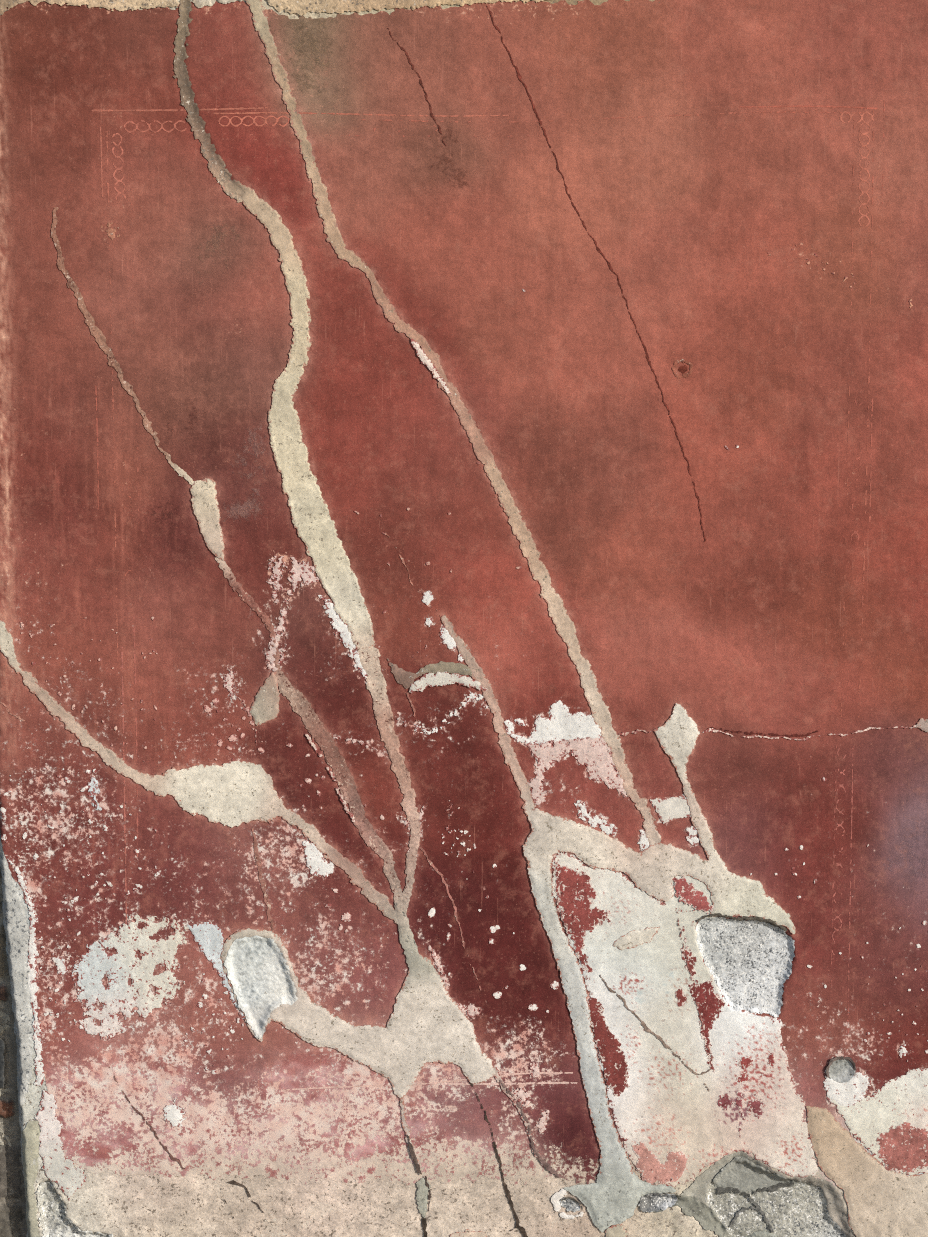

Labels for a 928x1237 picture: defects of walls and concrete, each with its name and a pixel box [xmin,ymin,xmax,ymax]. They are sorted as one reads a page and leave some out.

crack [486,5,706,542]
crack [0,0,481,990]
crack [245,0,661,845]
peeling [264,555,371,693]
peeling [422,591,464,663]
peeling [397,692,488,735]
peeling [504,700,629,805]
crack [702,718,928,740]
peeling [0,768,856,1237]
crack [400,1099,431,1237]
crack [469,1067,560,1237]
peeling [823,1003,928,1176]